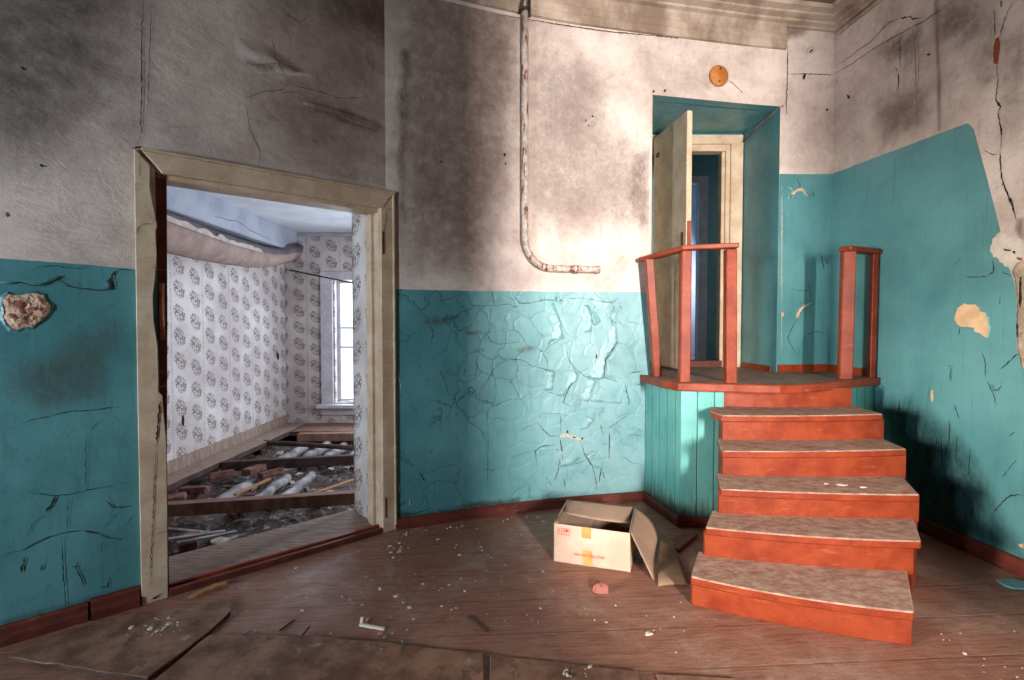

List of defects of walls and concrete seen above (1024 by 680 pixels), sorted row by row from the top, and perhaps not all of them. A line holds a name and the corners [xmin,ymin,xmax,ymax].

crack [130,1,152,174]
peeling [788,179,815,199]
crack [786,6,946,134]
crack [986,68,1016,218]
flaking render [0,291,54,333]
crack [10,265,132,291]
crack [418,293,643,490]
peeling [954,302,991,339]
crack [982,353,1019,402]
flaking render [990,232,1024,369]
crack [4,400,161,608]
crack [992,461,1019,515]